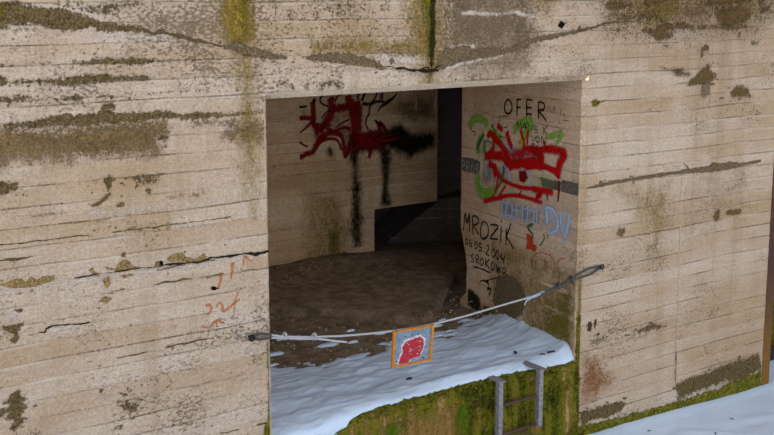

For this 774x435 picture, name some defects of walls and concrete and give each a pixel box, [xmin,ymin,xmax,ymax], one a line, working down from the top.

water stain [223,0,254,44]
water stain [360,0,440,84]
water stain [452,0,533,75]
crack [386,65,442,73]
water stain [0,121,170,167]
spalling [0,275,61,295]
spalling [88,252,140,303]
crack [73,250,269,284]
spalling [155,251,206,266]
crack [29,322,90,336]
rust [582,363,608,396]